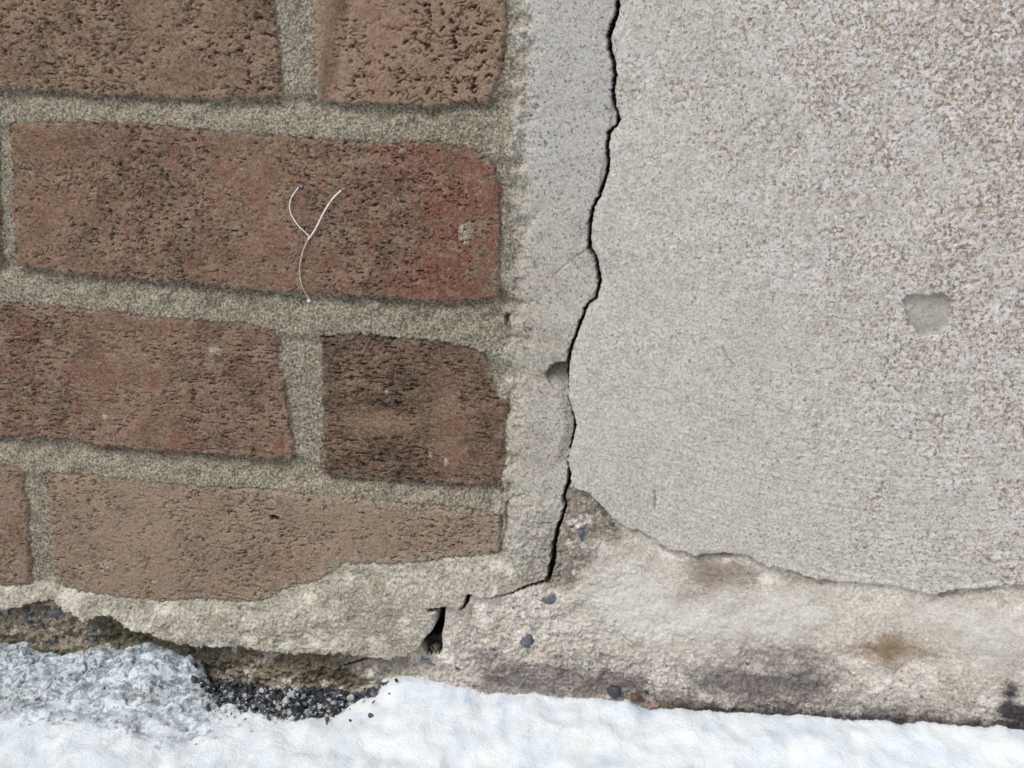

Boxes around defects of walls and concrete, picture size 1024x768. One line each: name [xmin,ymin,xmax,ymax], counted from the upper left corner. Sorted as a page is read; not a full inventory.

crack [554,0,622,370]
crack [501,493,526,545]
crack [506,419,577,595]
spalling [548,482,1024,598]
hole [424,607,446,655]
water stain [475,537,1024,730]